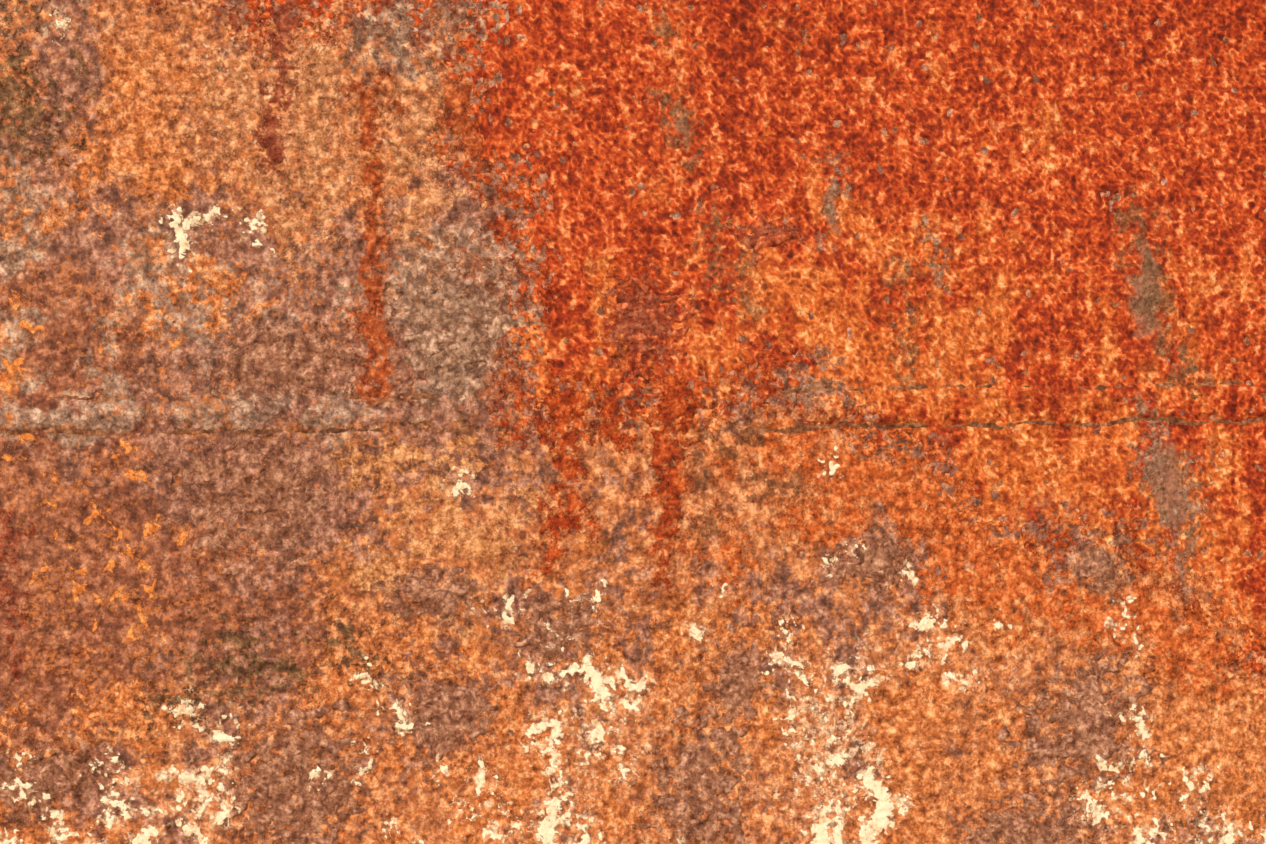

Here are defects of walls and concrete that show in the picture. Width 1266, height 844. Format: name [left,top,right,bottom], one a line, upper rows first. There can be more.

crack [7,391,514,442]
crack [739,380,1266,436]